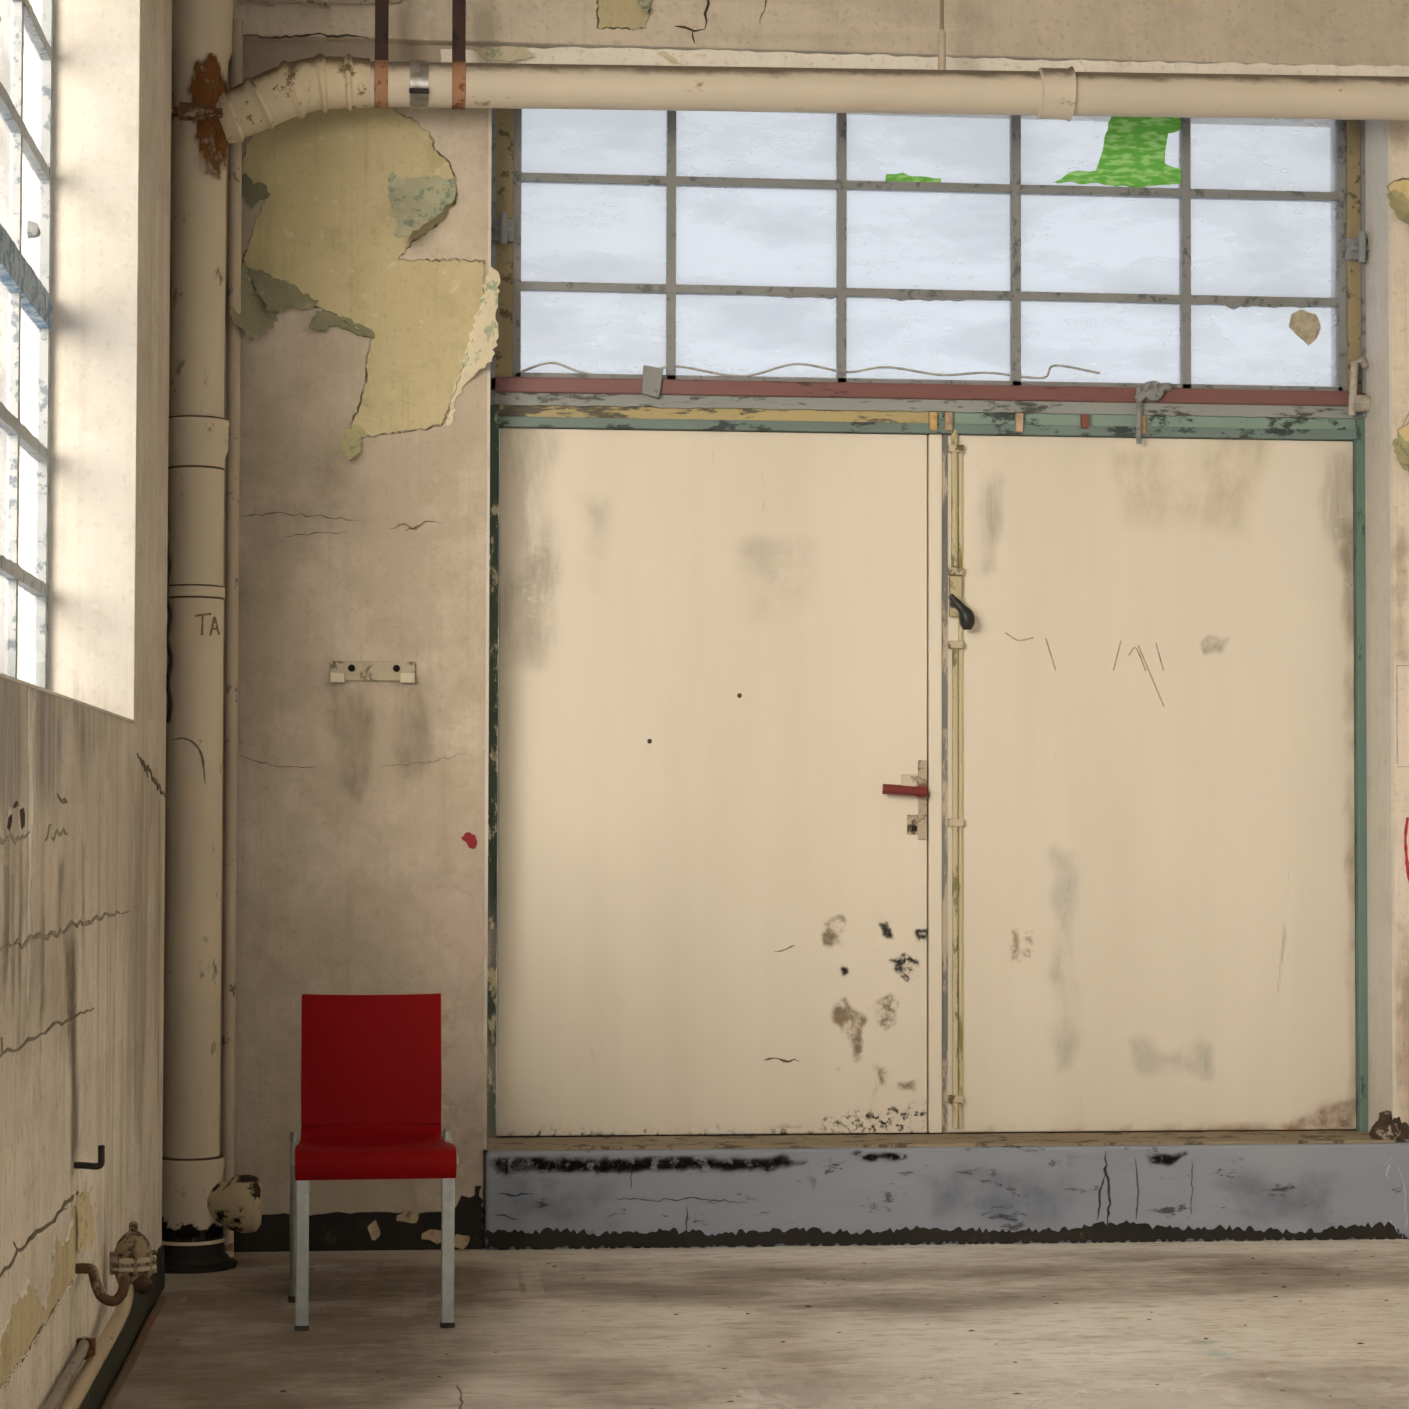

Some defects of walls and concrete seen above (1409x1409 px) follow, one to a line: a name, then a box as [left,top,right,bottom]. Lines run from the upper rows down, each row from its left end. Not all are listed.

peeling [596,0,652,30]
peeling [440,46,1409,77]
rust [189,53,228,179]
peeling [1386,178,1409,225]
peeling [229,107,500,460]
peeling [1392,421,1409,471]
crack [0,911,130,951]
crack [0,1008,94,1058]
crack [0,1191,79,1278]
peeling [0,1183,96,1394]
crack [456,1384,464,1409]